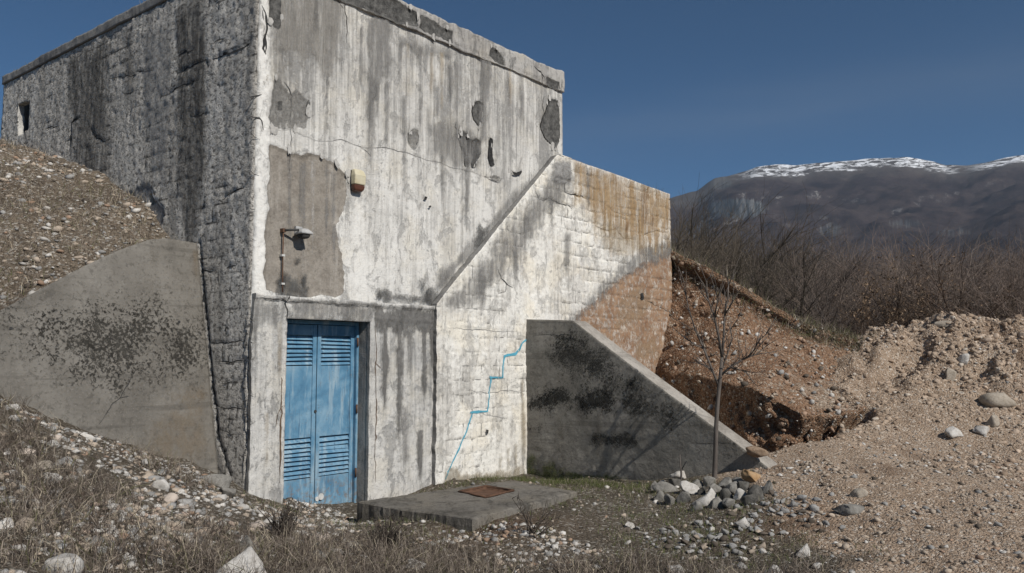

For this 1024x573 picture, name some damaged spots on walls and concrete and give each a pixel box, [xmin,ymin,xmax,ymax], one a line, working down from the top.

leakage [276,0,341,103]
spalling [489,44,505,65]
peeling [263,75,350,297]
spalling [408,125,419,149]
leakage [360,16,491,206]
spalling [455,100,522,182]
spalling [540,77,561,151]
leakage [2,293,208,398]
crack [200,245,370,483]
leakage [276,161,572,475]
leakage [522,242,680,444]
leakage [591,432,637,449]